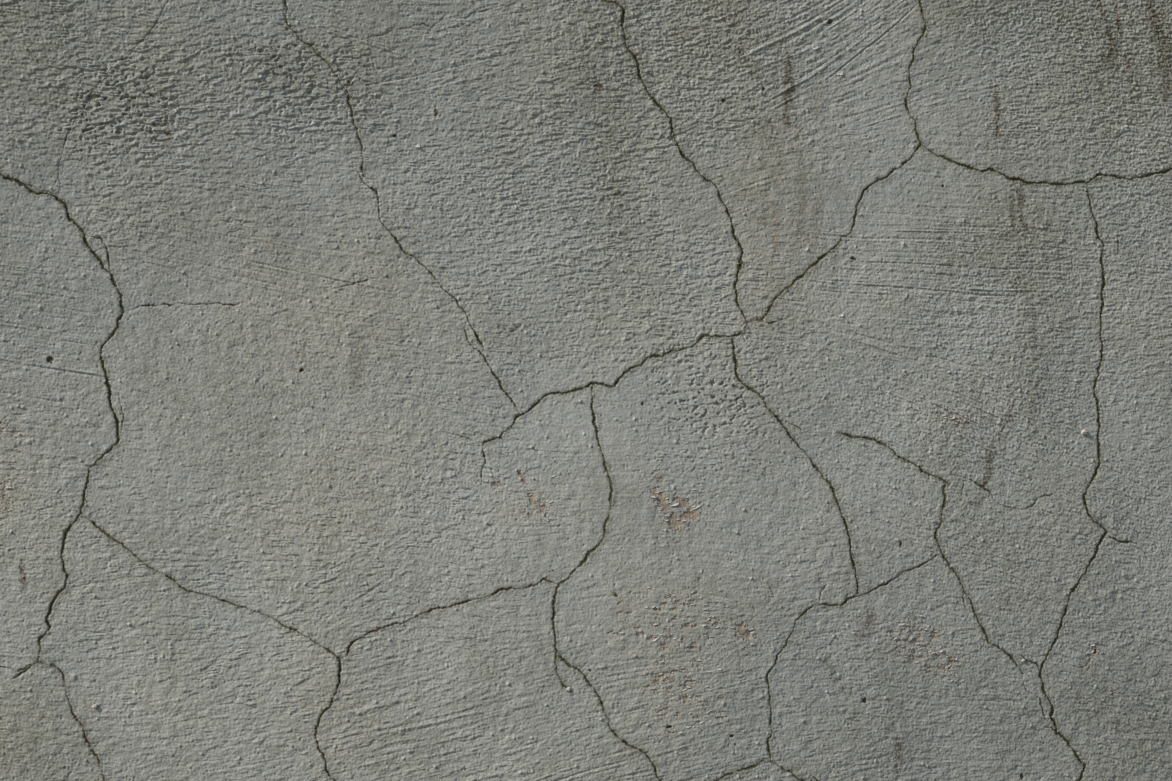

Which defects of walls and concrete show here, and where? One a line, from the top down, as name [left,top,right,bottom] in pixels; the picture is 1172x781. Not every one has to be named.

crack [0,174,470,781]
crack [284,0,1172,781]